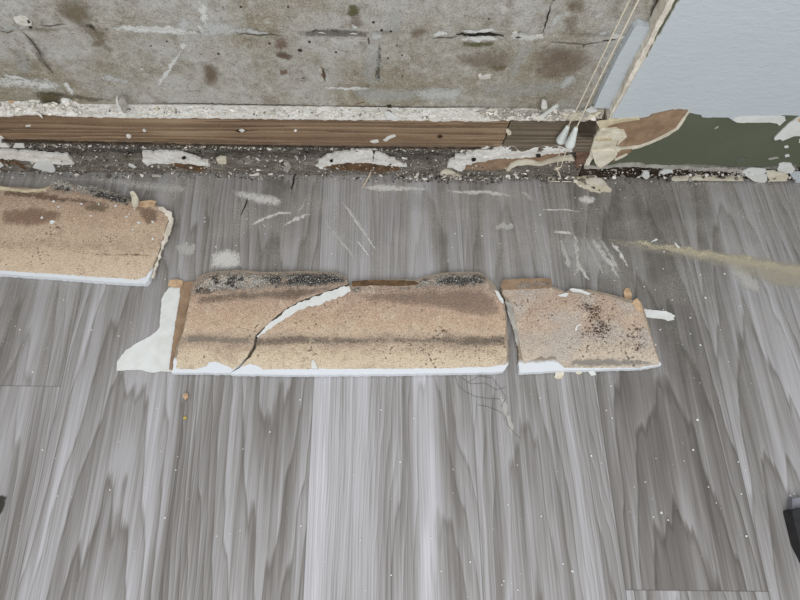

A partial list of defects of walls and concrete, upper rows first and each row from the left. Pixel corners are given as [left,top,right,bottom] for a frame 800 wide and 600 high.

crack [543,0,600,48]
crack [433,28,504,47]
peeling [733,116,800,141]
flaking render [0,136,25,148]